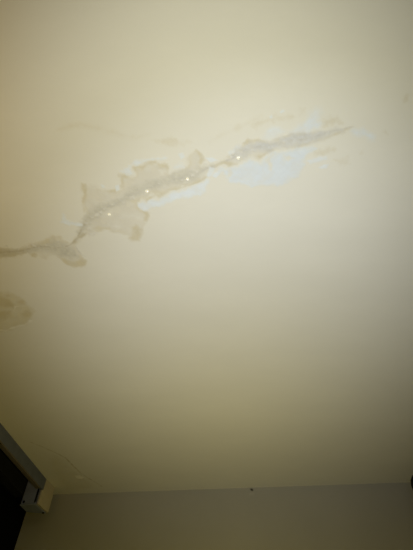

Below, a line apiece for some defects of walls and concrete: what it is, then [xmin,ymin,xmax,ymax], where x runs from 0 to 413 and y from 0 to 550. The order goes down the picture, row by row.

crack [0,125,352,258]
damp [0,104,354,269]
peeling [135,144,331,213]